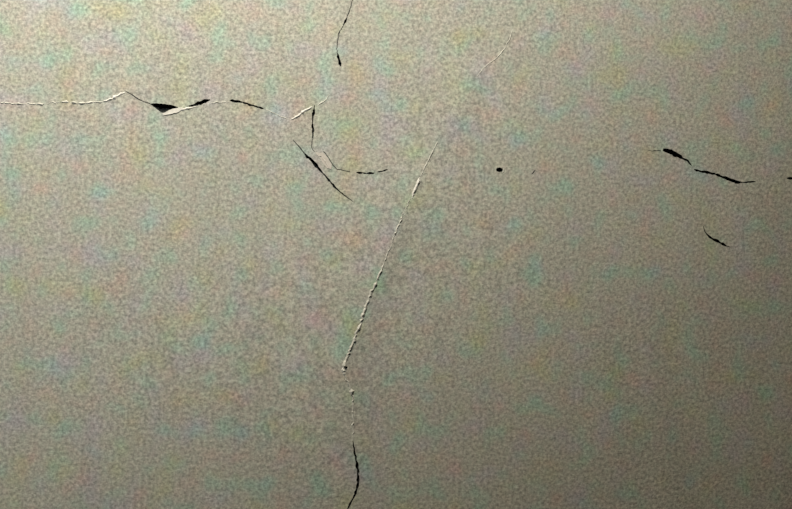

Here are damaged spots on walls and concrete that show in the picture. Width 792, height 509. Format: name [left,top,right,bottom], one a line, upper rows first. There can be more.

crack [336,0,353,66]
crack [0,91,150,106]
crack [649,148,756,184]
crack [703,226,730,247]
crack [341,142,438,509]